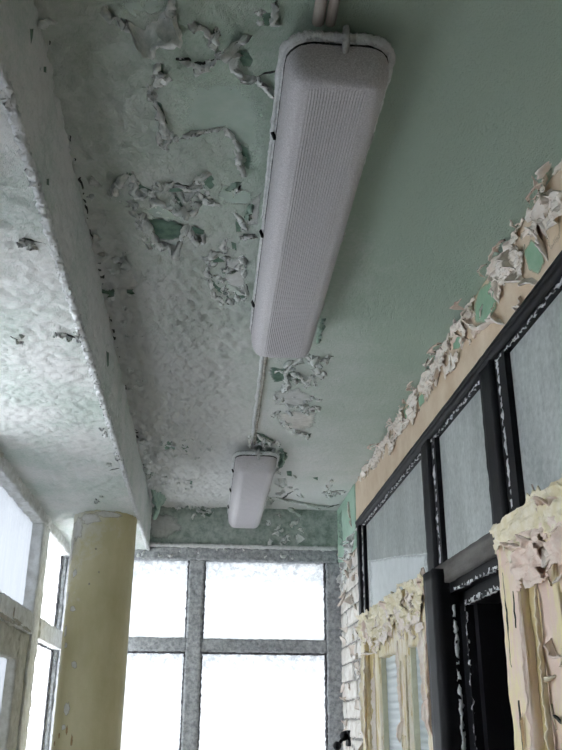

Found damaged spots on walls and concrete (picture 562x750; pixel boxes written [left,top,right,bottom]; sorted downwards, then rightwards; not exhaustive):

peeling [101,0,276,194]
peeling [254,0,281,27]
peeling [107,171,260,306]
peeling [268,353,333,440]
peeling [358,159,562,482]
peeling [323,479,433,750]
peeling [489,474,562,750]